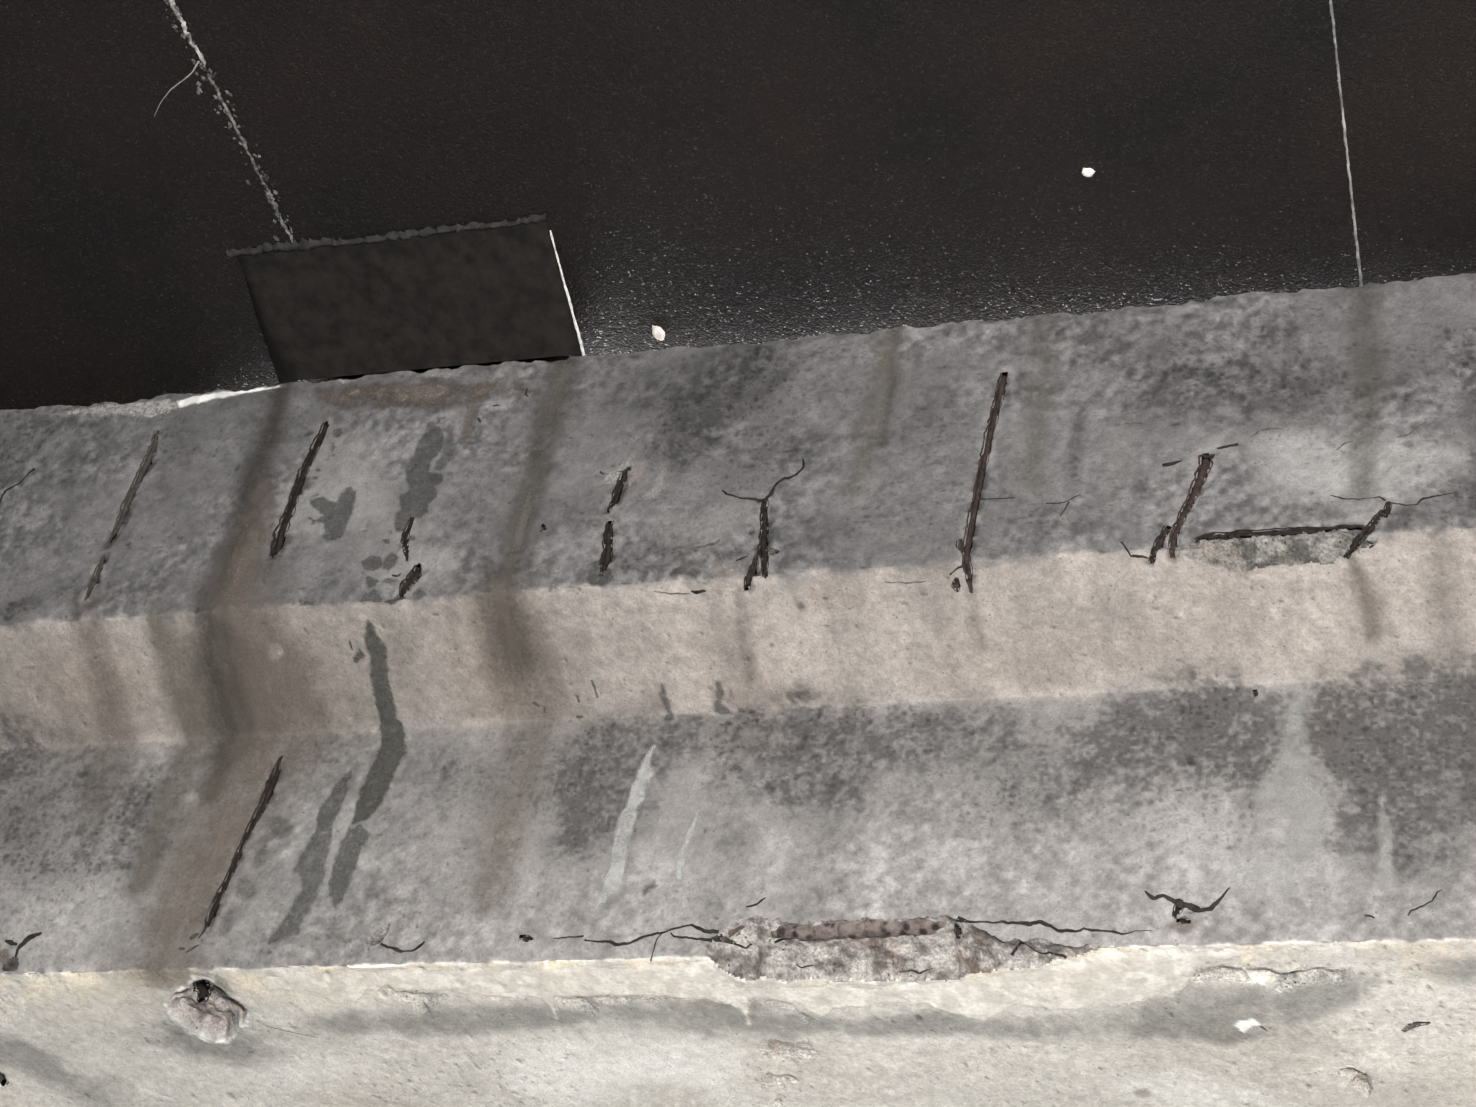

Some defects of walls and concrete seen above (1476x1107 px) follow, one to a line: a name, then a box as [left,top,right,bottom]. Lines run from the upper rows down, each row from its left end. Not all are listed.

spalling [1120,443,1454,572]
damp [268,622,406,944]
spalling [36,975,250,1044]
crack [553,924,719,974]
peeling [261,915,1355,1107]
crack [956,887,1230,935]